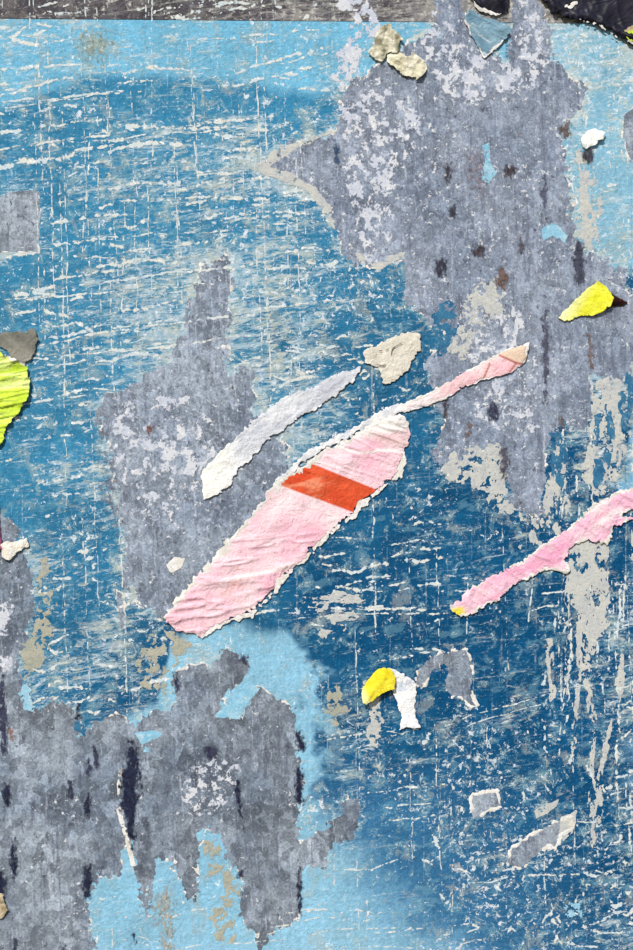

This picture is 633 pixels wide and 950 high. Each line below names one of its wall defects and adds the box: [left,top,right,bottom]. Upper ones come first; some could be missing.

peeling [0,190,41,254]
peeling [261,0,633,549]
peeling [0,252,361,950]
peeling [415,647,479,709]
peeling [469,788,502,819]
peeling [502,814,575,870]